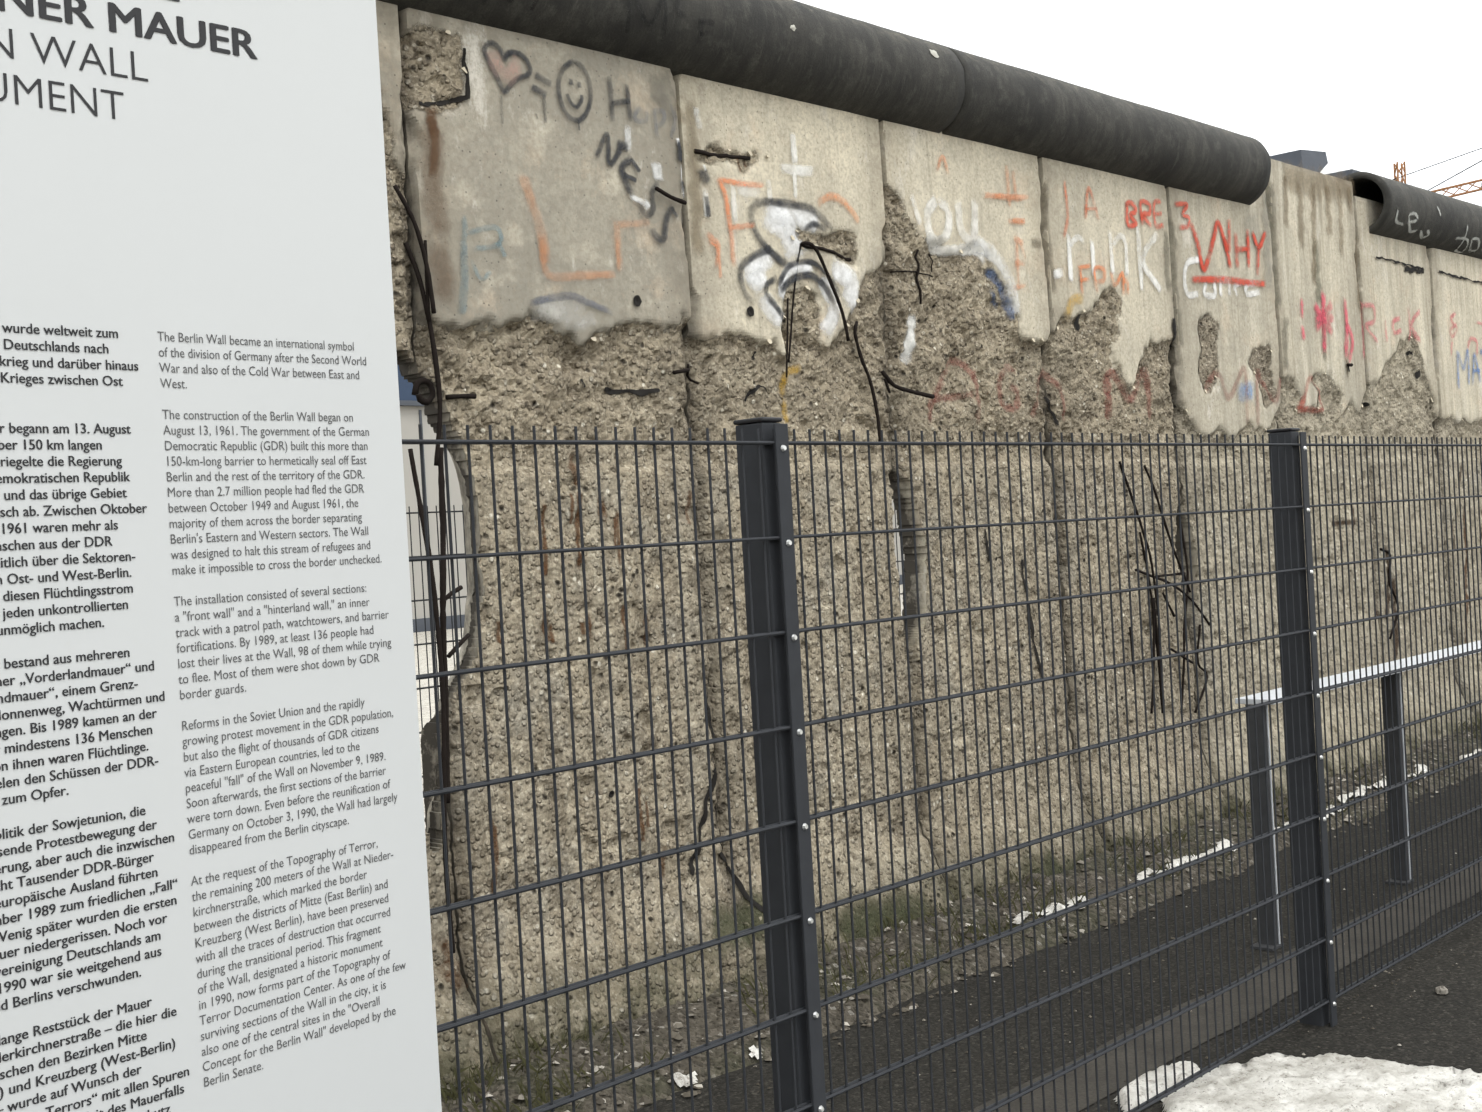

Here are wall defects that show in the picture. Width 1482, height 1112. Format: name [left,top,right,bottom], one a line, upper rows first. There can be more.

corrosion [428,115,438,170]
spalling [400,24,469,114]
spalling [382,110,1482,1086]
crack [689,672,763,912]